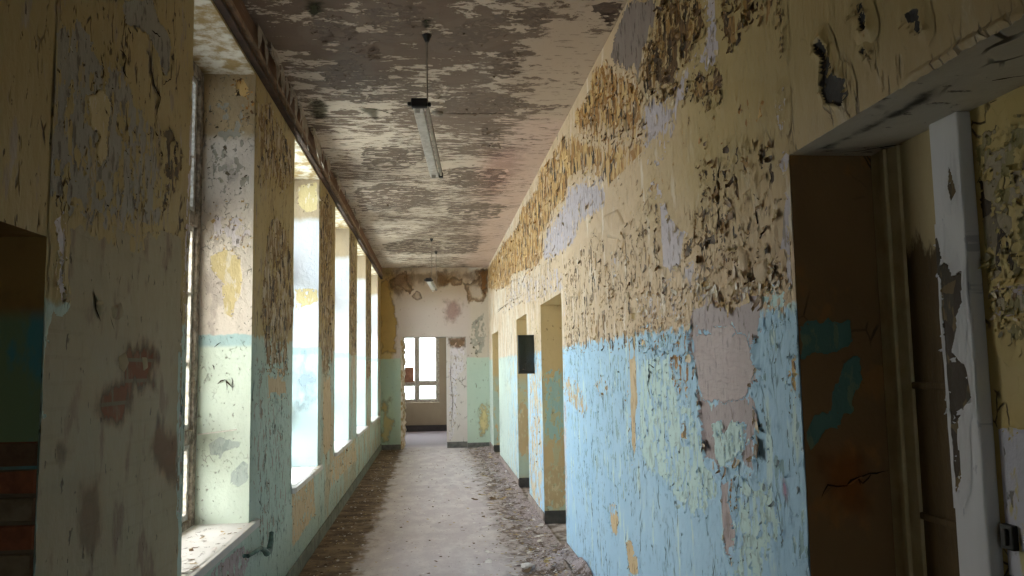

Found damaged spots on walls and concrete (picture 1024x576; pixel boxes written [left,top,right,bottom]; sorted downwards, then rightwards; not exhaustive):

flaking render [35,65,357,576]
peeling [296,0,810,576]
peeling [807,0,879,121]
peeling [933,95,1024,510]